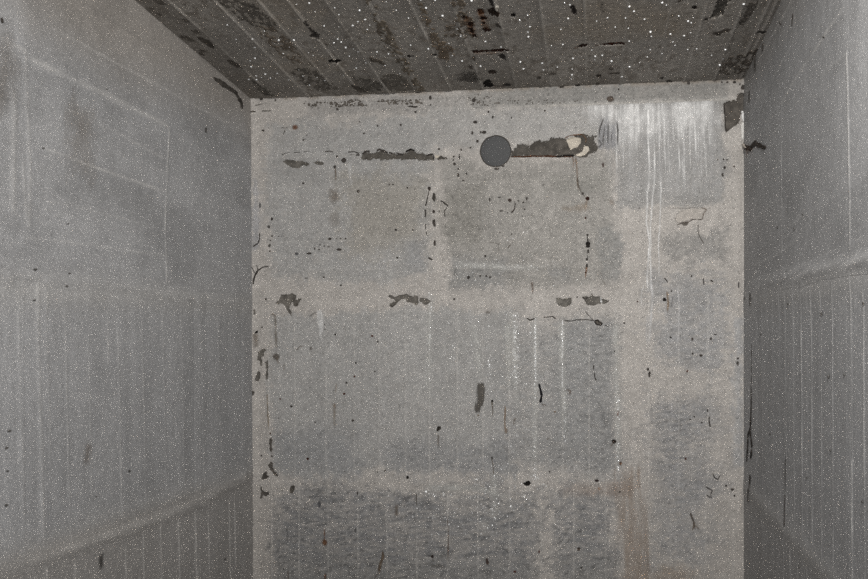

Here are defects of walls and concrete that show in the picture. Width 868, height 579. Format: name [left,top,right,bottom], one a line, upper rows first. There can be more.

spalling [703,0,731,21]
peeling [713,1,758,36]
peeling [218,0,338,101]
spalling [719,48,758,139]
spalling [336,102,500,181]
spalling [494,133,599,170]
water stain [591,102,710,295]
spalling [265,293,301,316]
spalling [388,294,431,307]